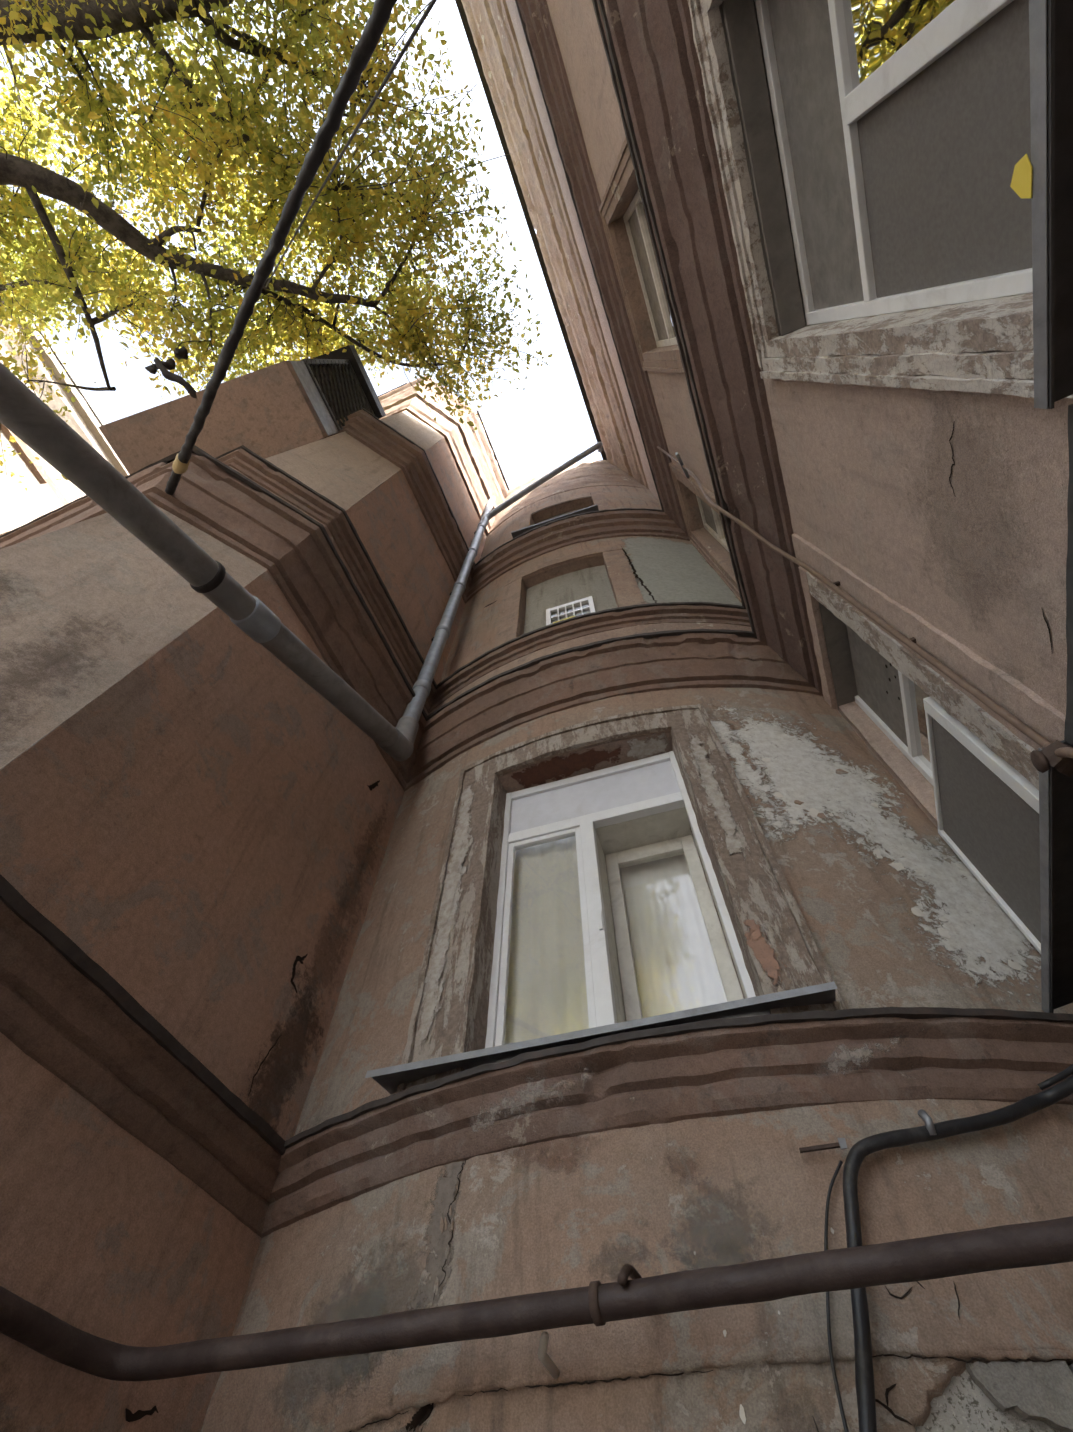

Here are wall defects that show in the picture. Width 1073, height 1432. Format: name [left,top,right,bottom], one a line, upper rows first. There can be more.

peeling [511,733,669,789]
peeling [688,699,1041,1004]
peeling [419,786,475,1051]
crack [885,1281,960,1320]
crack [875,1384,912,1425]
spalling [915,1360,1073,1432]